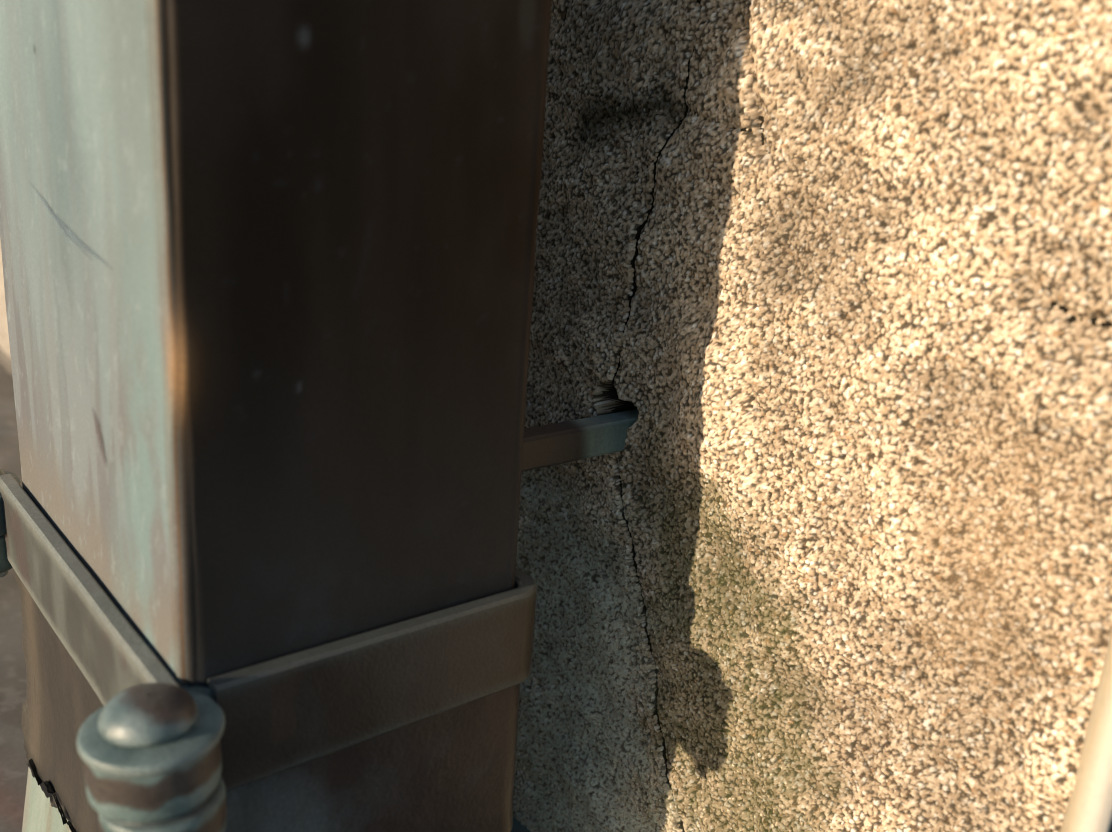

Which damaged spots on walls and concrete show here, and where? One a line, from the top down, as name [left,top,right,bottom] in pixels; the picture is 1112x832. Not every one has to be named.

crack [612,0,706,388]
crack [733,116,767,152]
crack [619,471,693,832]